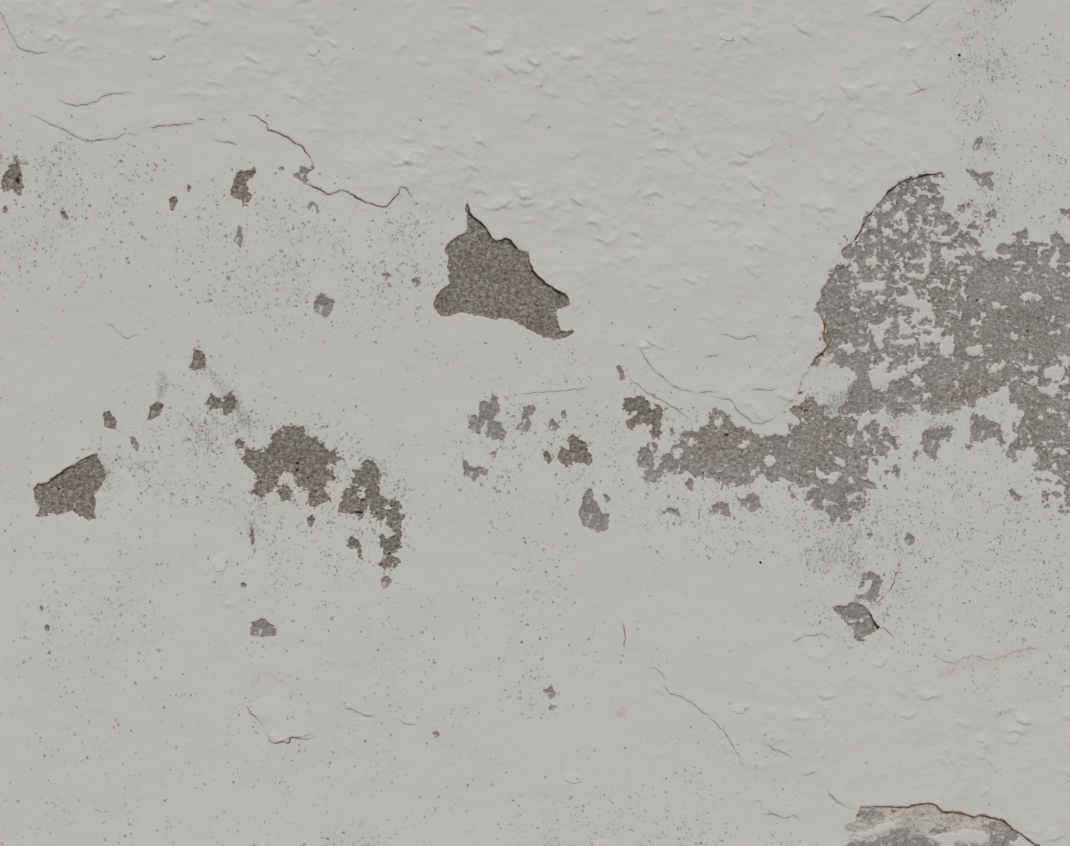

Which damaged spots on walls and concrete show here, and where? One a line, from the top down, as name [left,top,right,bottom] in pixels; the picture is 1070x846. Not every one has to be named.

crack [251,115,413,207]
peeling [433,200,574,340]
peeling [622,168,1070,530]
peeling [462,393,536,481]
peeling [543,410,593,467]
peeling [33,453,106,521]
peeling [235,423,405,588]
peeling [578,488,611,533]
peeling [832,571,883,641]
peeling [844,802,1040,846]